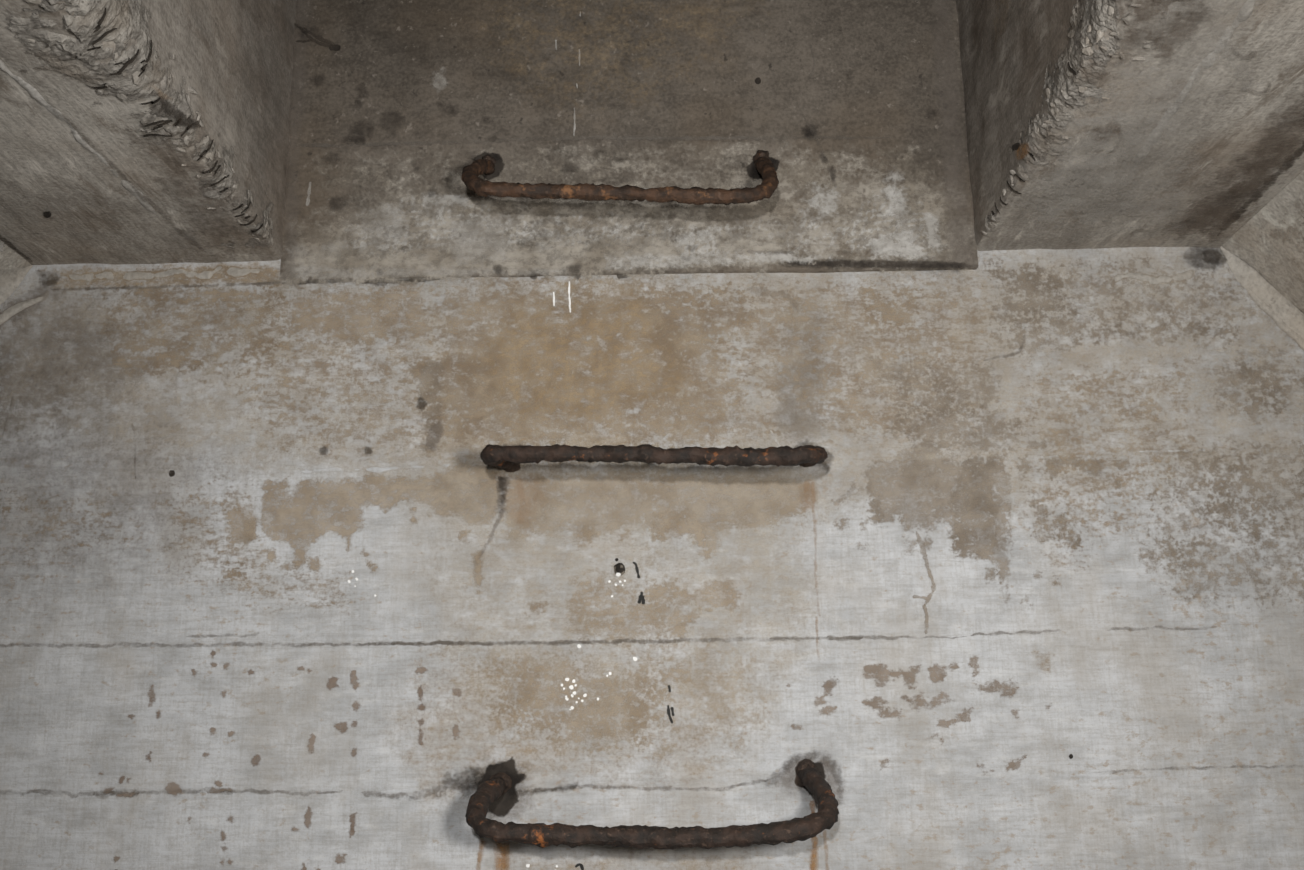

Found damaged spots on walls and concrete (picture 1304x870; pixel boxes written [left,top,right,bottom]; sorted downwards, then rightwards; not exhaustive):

spalling [7,0,274,249]
spalling [981,0,1167,237]